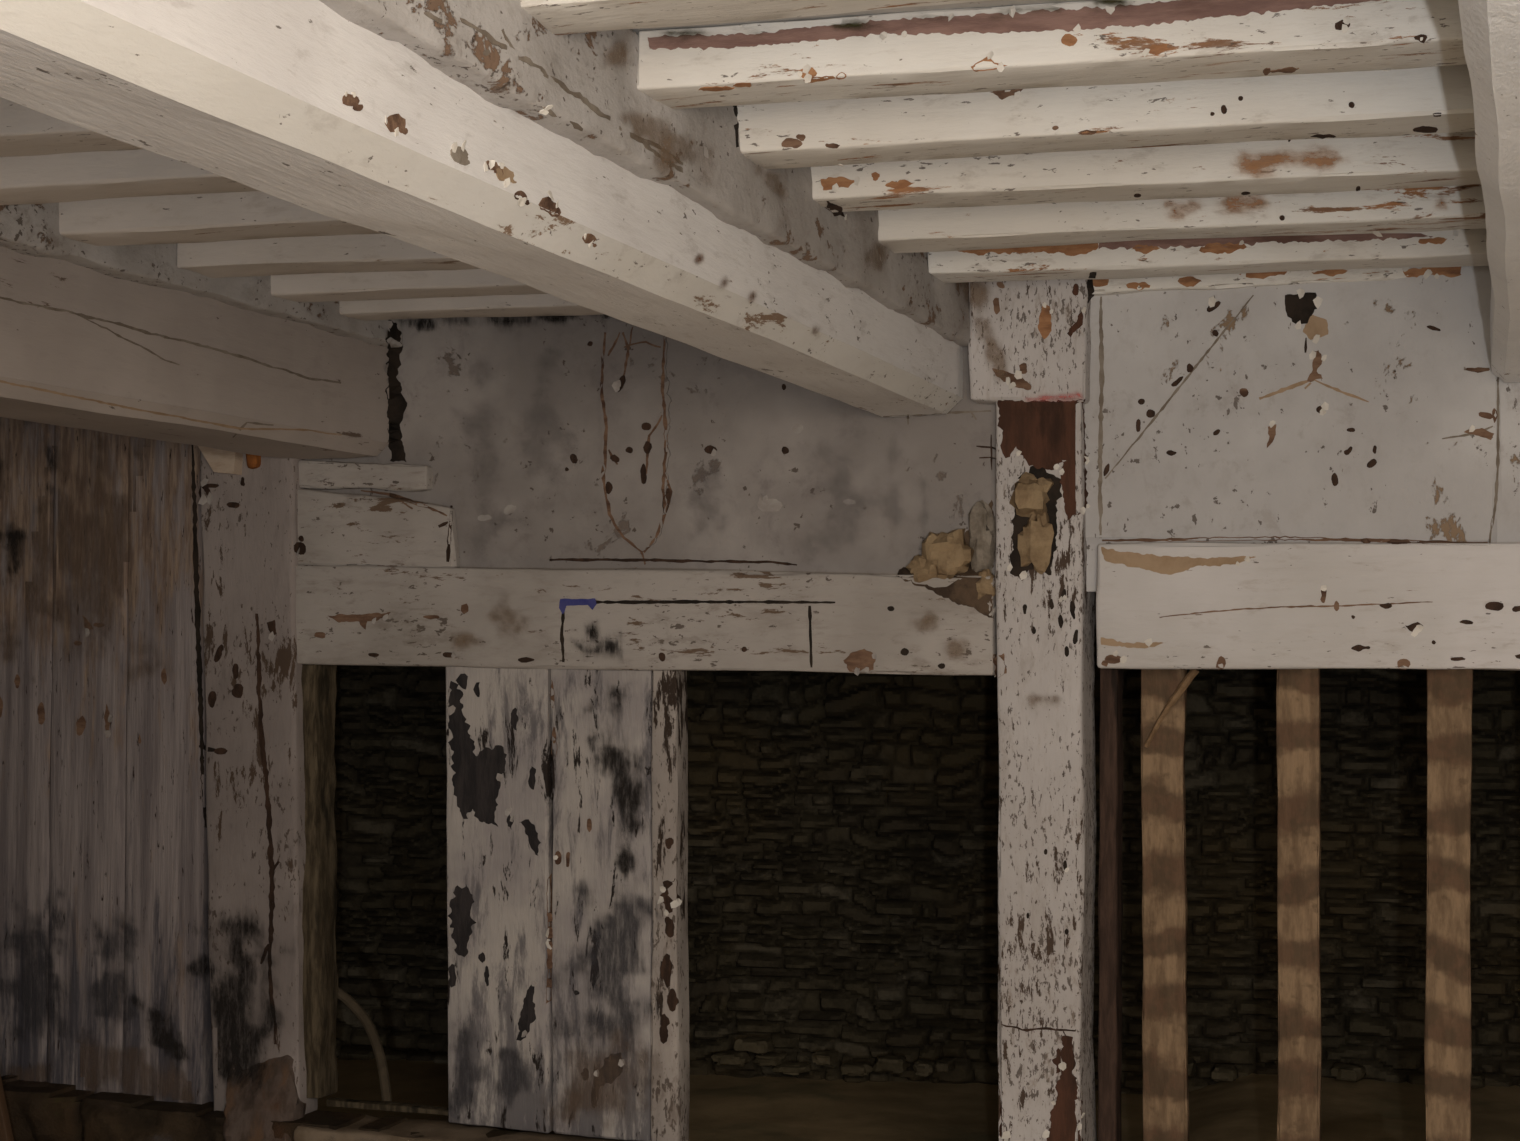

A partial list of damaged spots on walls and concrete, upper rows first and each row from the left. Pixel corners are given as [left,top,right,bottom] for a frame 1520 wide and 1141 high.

peeling [648,0,1381,51]
peeling [959,215,1462,256]
peeling [1038,272,1150,339]
peeling [897,363,1110,618]
damp [0,464,136,627]
peeling [1485,602,1520,612]
damp [589,737,642,832]
damp [617,849,635,876]
damp [80,921,193,1104]
damp [188,918,279,1085]
damp [572,898,653,1046]
peeling [1042,1035,1085,1141]